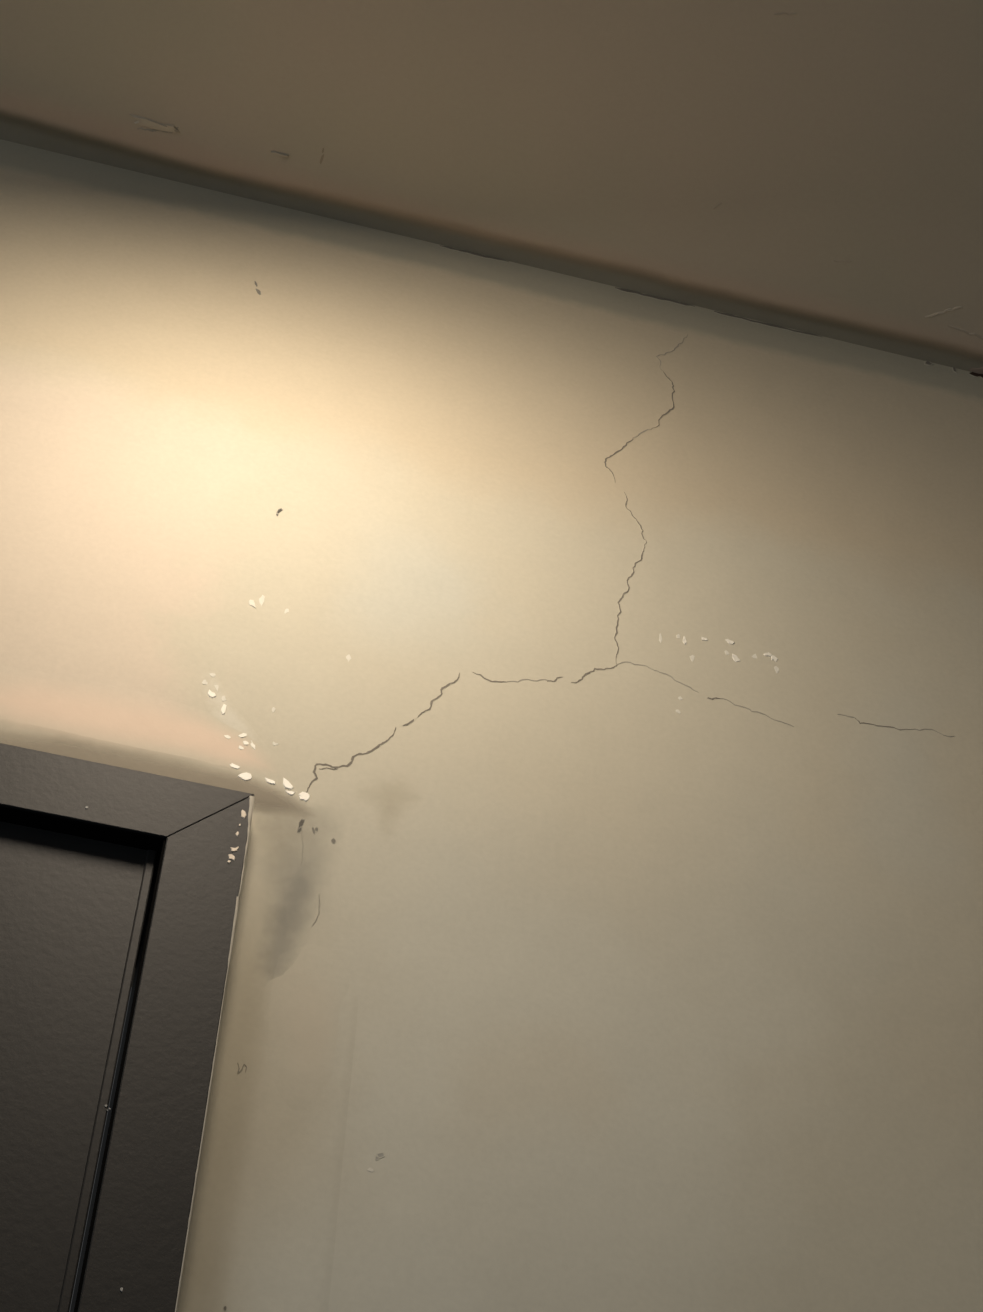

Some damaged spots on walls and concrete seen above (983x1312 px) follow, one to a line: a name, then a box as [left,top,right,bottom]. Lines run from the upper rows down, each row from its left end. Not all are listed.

crack [306,287,823,793]
peeling [724,639,779,673]
peeling [198,661,310,802]
crack [837,714,954,737]
spalling [297,818,336,844]